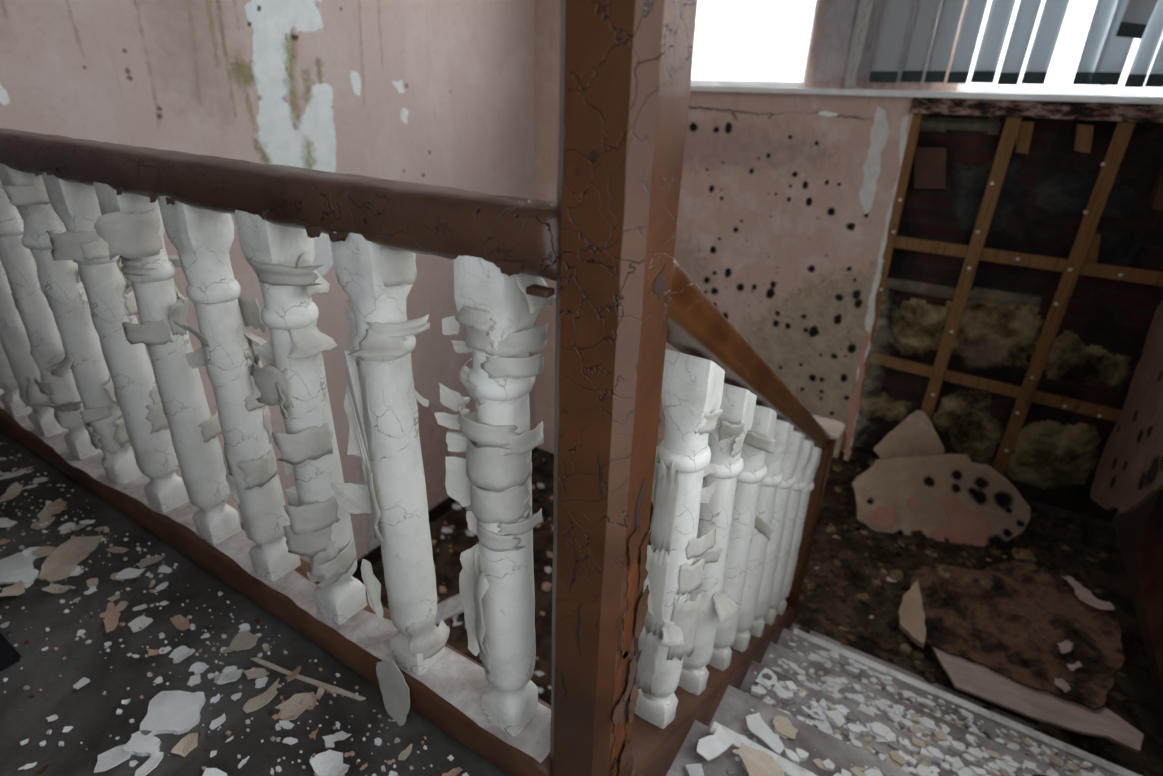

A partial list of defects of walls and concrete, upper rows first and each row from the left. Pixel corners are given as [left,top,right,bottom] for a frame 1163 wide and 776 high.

peeling [236,0,336,173]
damp [768,172,812,206]
damp [704,257,883,440]
spalling [843,107,908,461]
damp [952,470,1024,549]